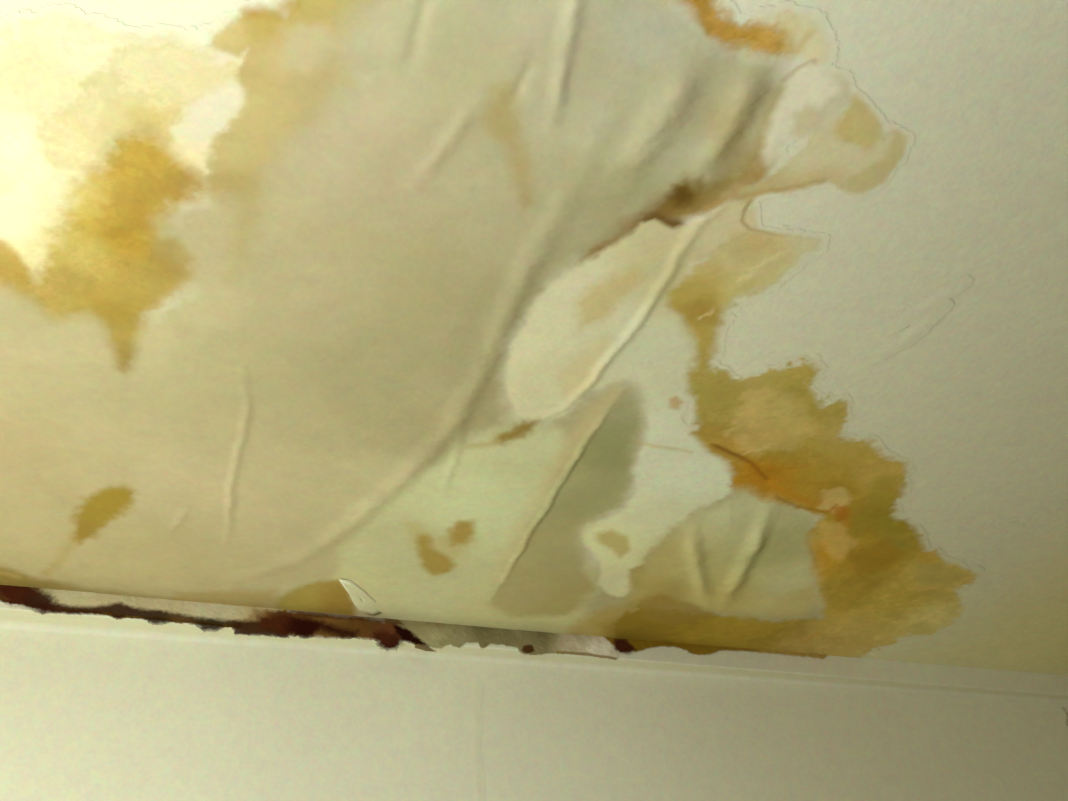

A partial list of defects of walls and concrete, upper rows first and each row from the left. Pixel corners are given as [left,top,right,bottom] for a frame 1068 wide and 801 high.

peeling [339,579,382,616]
leakage [0,0,916,652]
peeling [398,620,619,660]
leakage [565,225,1068,676]